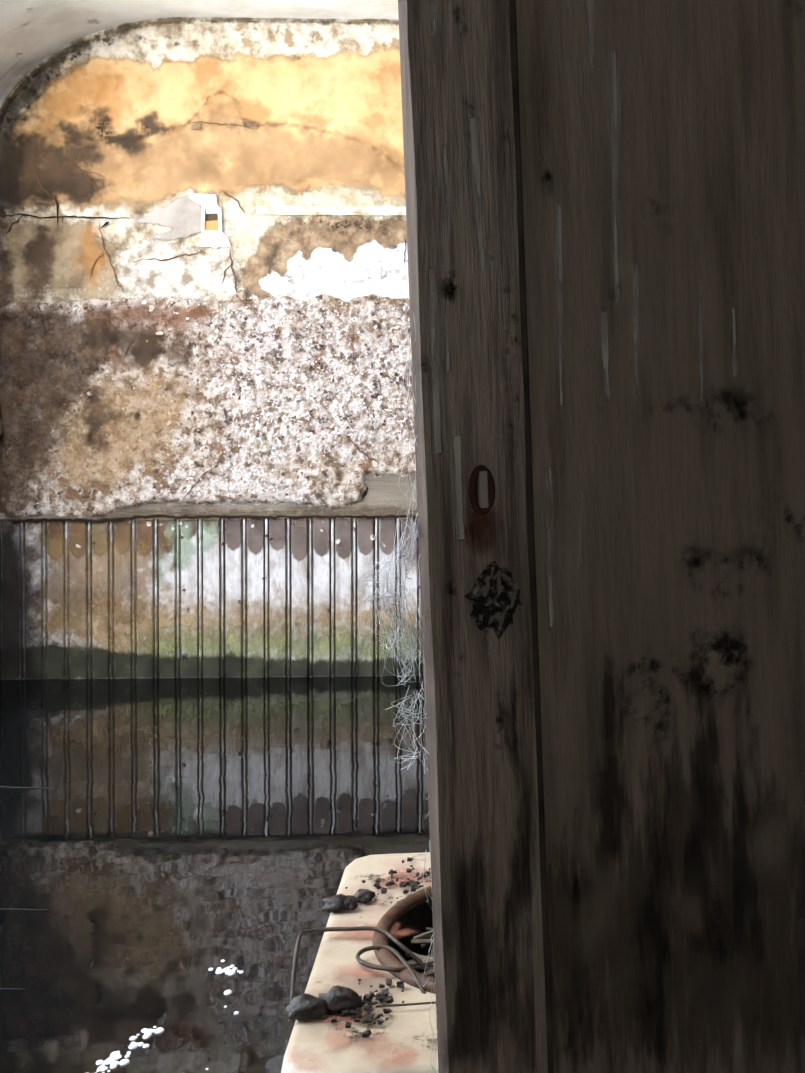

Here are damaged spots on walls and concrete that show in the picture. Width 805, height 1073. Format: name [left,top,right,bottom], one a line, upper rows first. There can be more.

damp [0,106,422,679]
spalling [0,46,427,561]